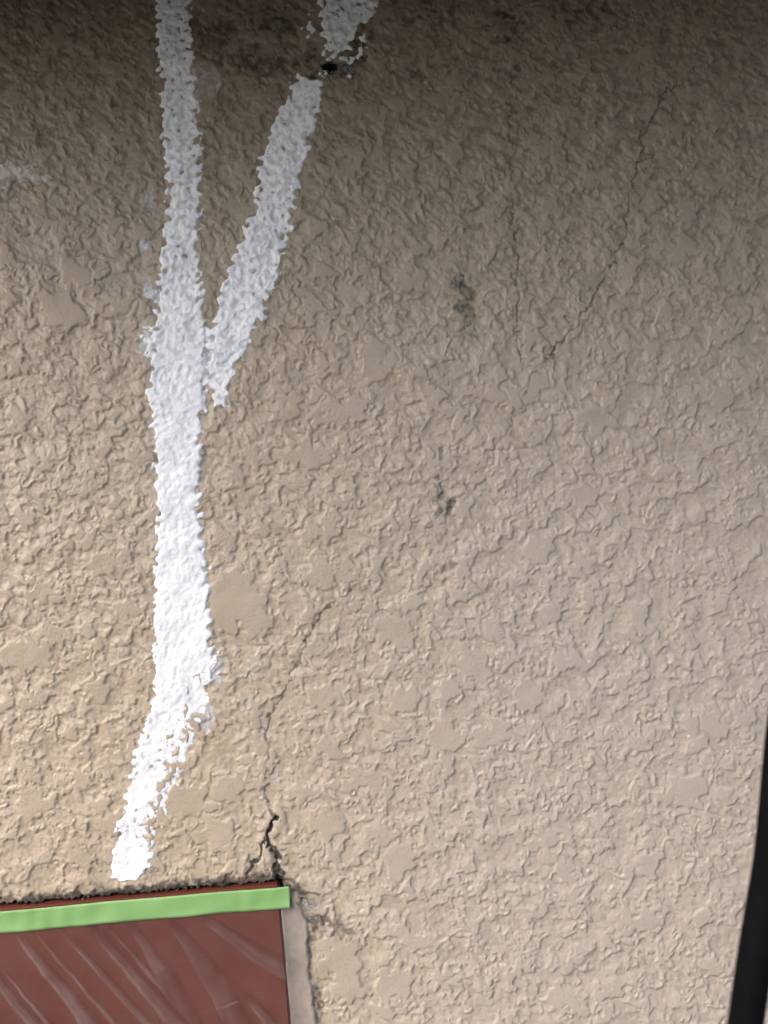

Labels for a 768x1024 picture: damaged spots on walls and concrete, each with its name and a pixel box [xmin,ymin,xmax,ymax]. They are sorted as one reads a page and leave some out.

crack [246,816,293,881]